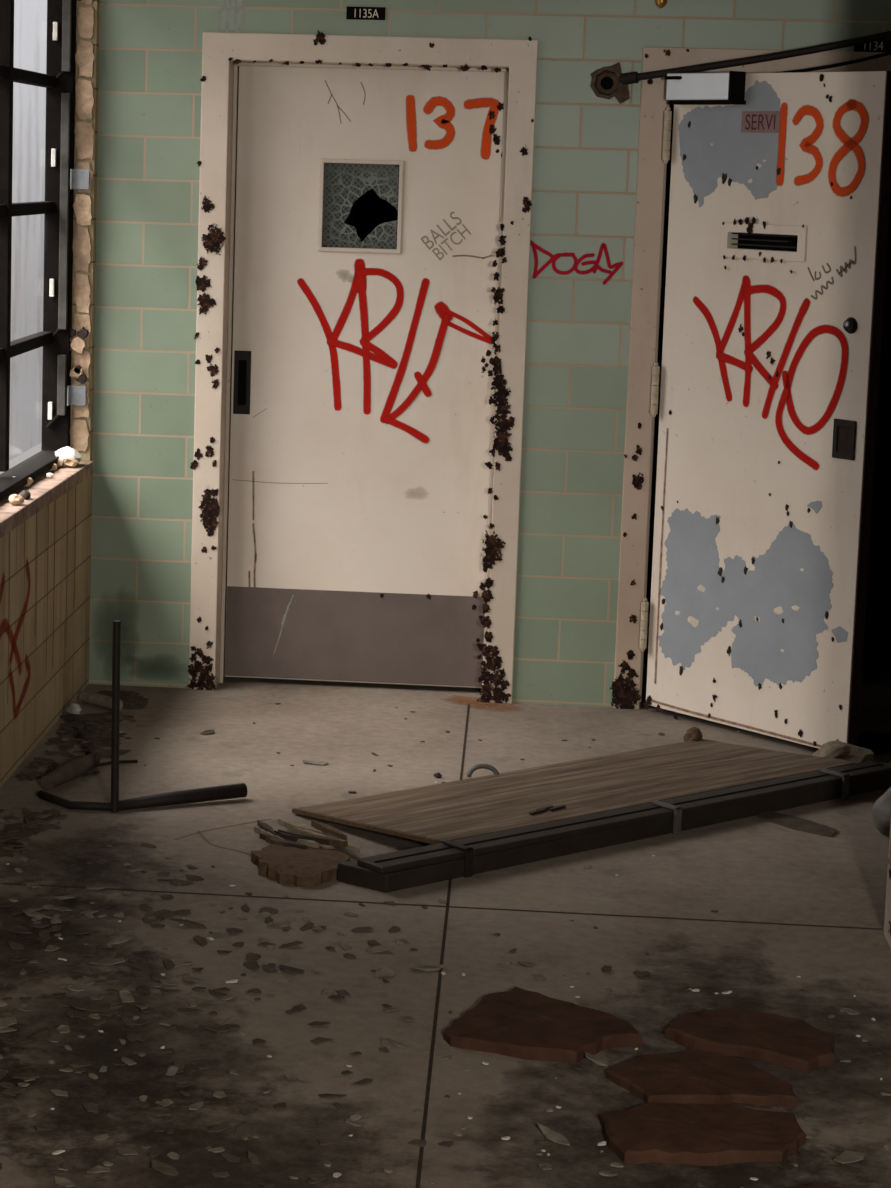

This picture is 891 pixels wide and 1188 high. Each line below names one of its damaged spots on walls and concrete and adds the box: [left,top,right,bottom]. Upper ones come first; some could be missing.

peeling [678,80,781,208]
rust [195,196,226,315]
peeling [722,217,766,236]
rust [190,437,218,470]
rust [198,486,221,553]
rust [481,332,515,471]
peeling [807,501,822,514]
rust [186,617,216,691]
rust [450,523,514,710]
peeling [658,504,848,690]
damp [666,958,891,1108]
damp [524,1087,882,1188]